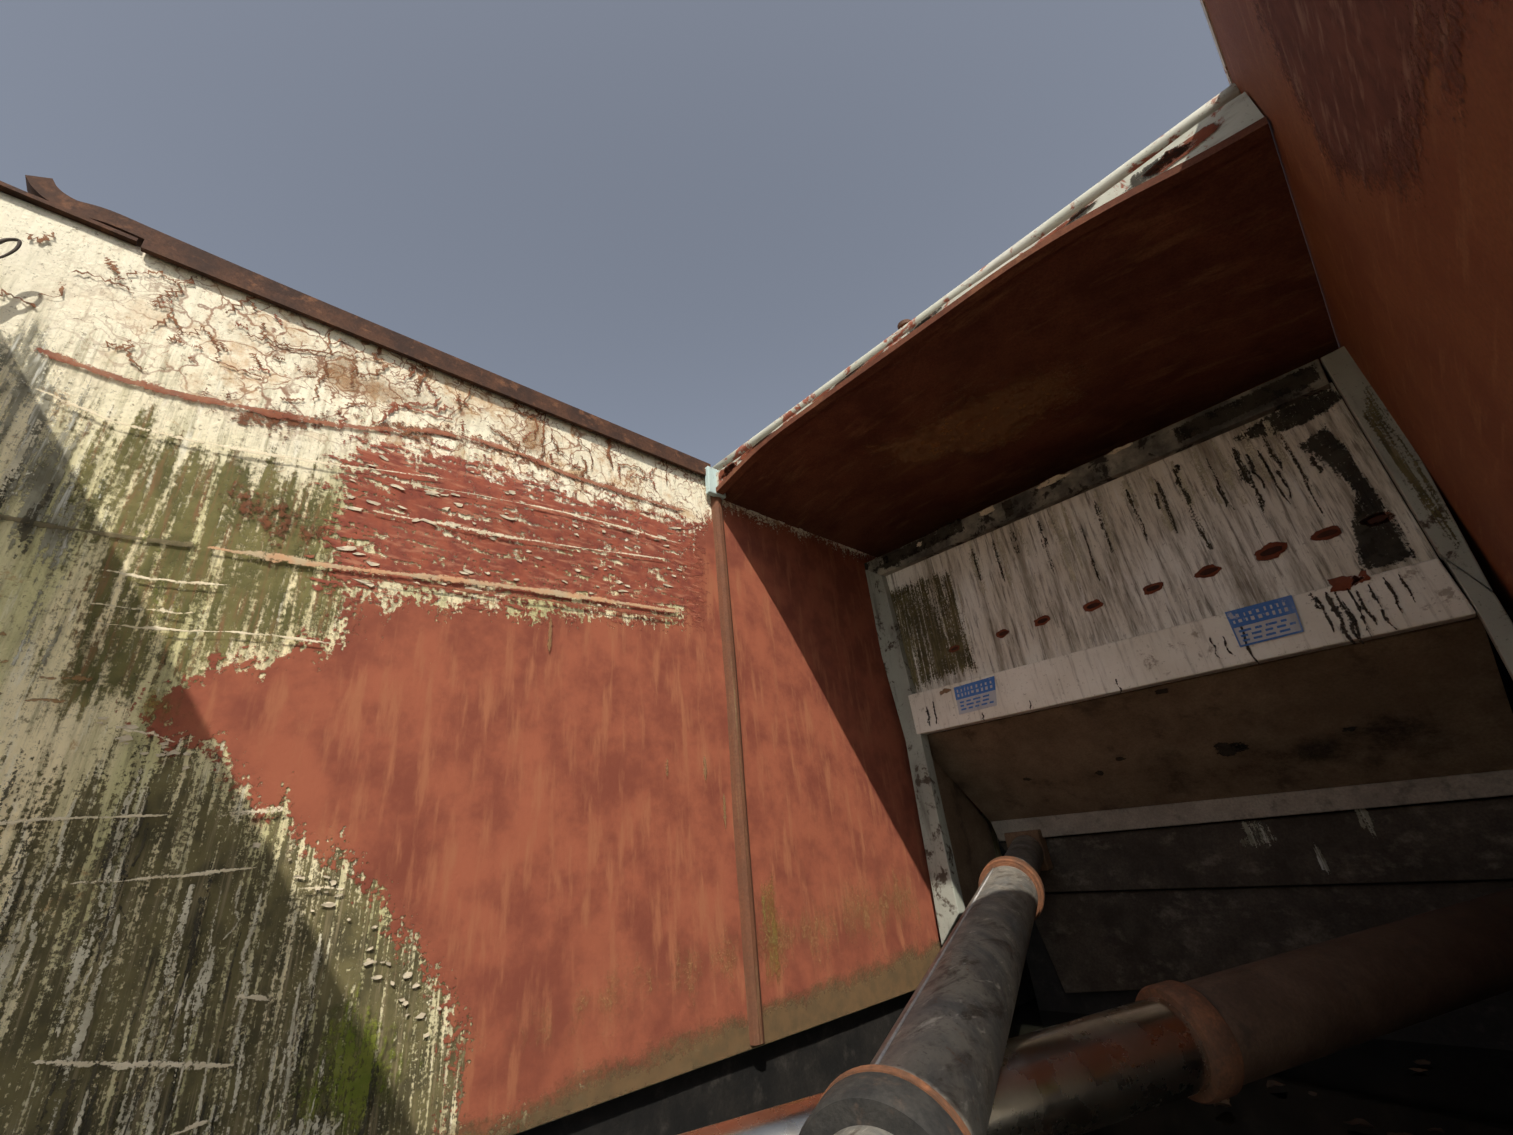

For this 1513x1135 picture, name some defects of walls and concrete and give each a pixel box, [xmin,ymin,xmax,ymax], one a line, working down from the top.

crack [26,232,55,243]
crack [0,257,668,490]
leakage [0,751,23,808]
peeling [96,390,941,1135]
leakage [0,798,77,994]
leakage [35,768,264,1135]
leakage [252,933,343,1135]